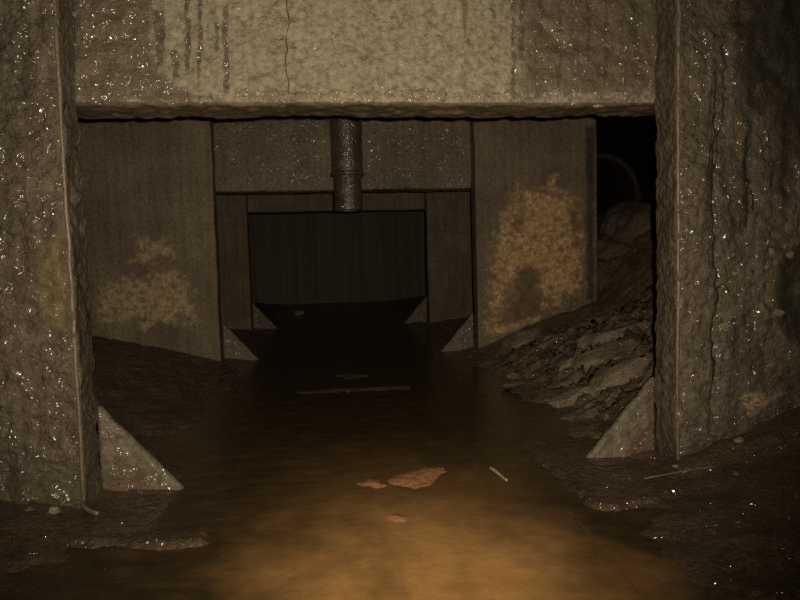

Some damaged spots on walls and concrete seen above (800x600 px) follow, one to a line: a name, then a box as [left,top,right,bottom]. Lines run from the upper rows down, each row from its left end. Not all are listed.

damp [73,0,203,106]
damp [214,7,229,92]
crack [707,46,730,423]